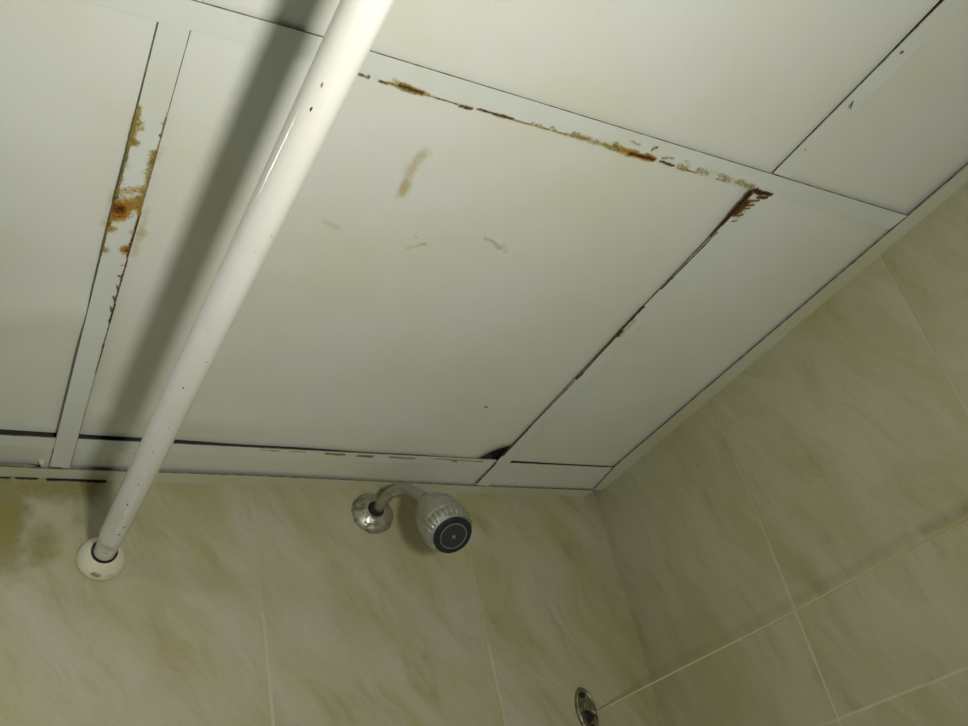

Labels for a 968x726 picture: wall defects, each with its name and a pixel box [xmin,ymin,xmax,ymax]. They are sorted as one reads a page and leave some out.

corrosion [95,106,168,374]
corrosion [358,73,774,289]
corrosion [440,306,645,484]